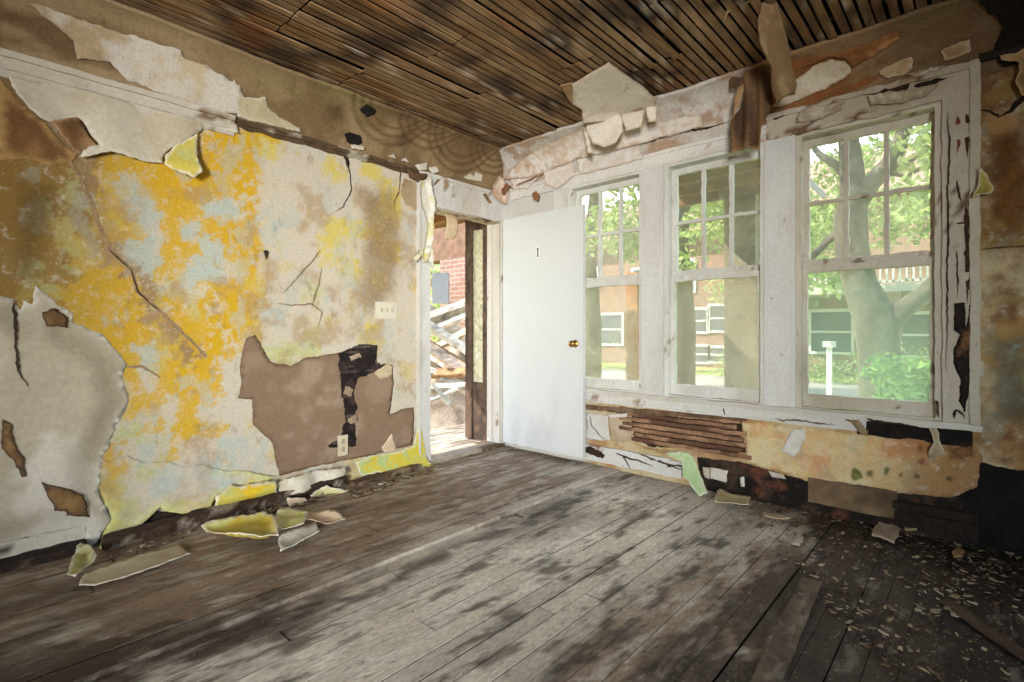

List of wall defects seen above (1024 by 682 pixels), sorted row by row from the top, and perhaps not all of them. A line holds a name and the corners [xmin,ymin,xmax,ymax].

peeling [30,3,301,132]
peeling [772,30,901,123]
peeling [867,40,971,105]
flaking render [0,78,96,166]
crack [333,156,352,213]
crack [67,162,208,358]
crack [264,250,322,325]
crack [127,365,160,378]
flaking render [238,335,414,476]
peeling [586,413,786,482]
mould [852,467,902,480]
spalling [954,462,1024,559]